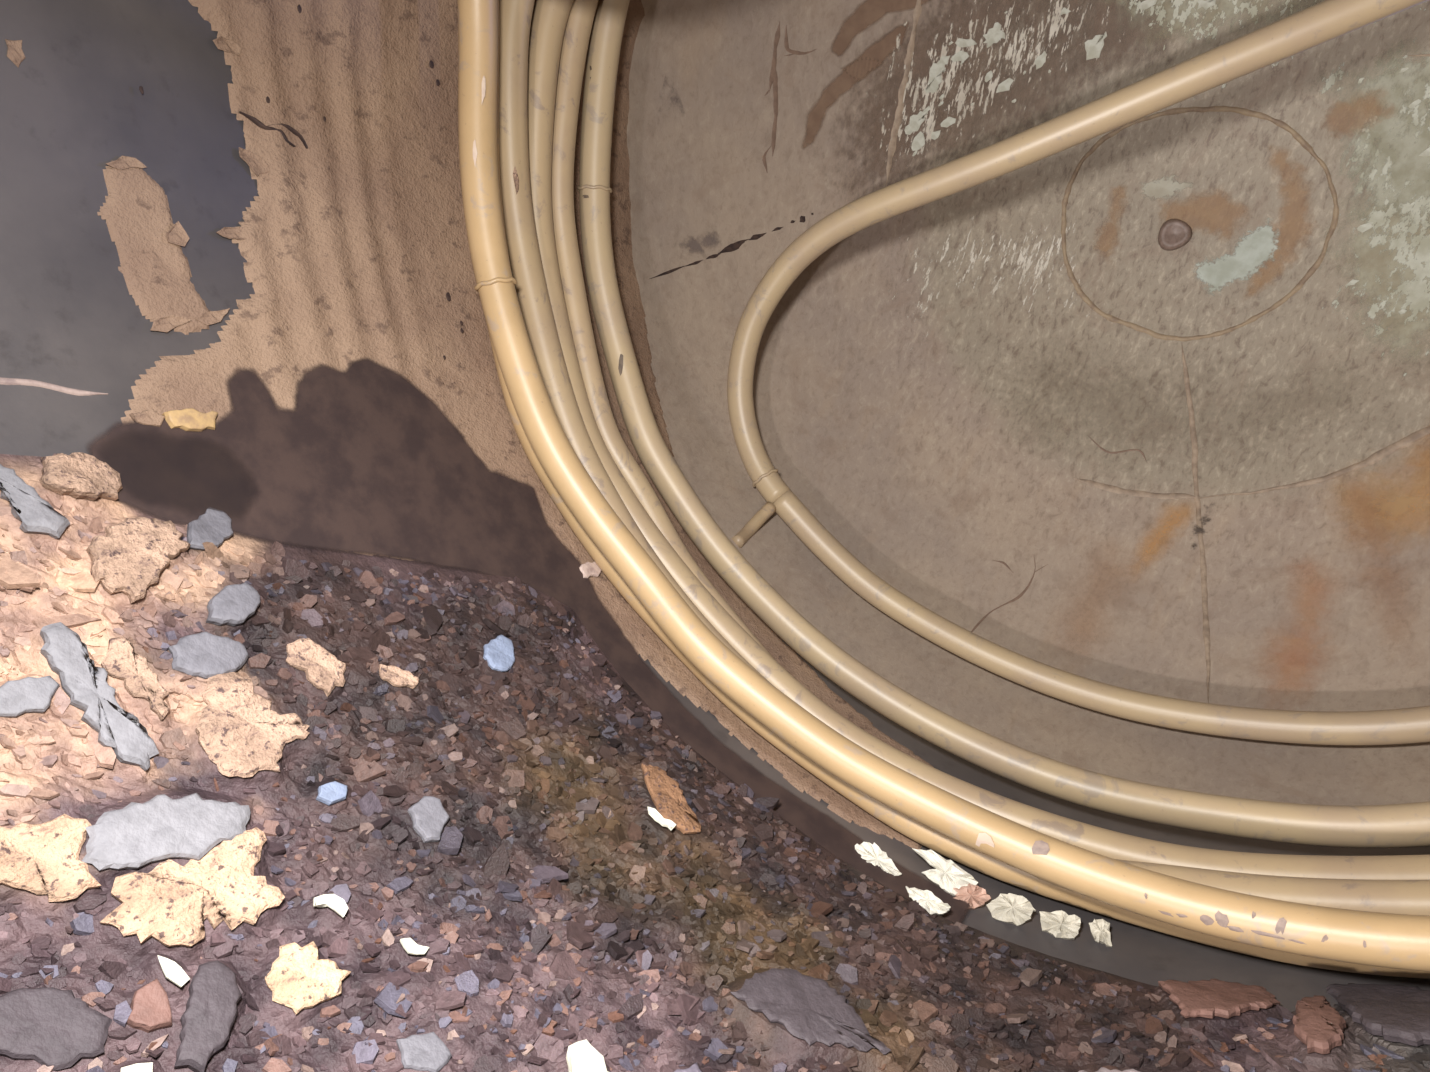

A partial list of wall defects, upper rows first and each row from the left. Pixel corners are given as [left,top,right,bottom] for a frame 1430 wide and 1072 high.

water stain [803,0,1320,175]
crack [650,213,813,279]
water stain [889,216,1082,337]
water stain [1141,175,1193,199]
water stain [1196,218,1278,292]
water stain [1320,41,1430,357]
peeling [39,452,123,501]
peeling [86,0,1112,947]